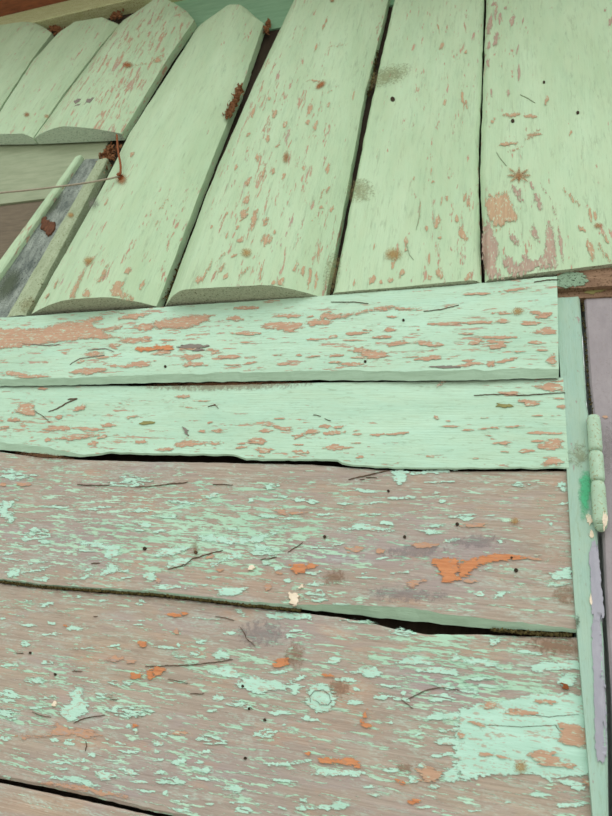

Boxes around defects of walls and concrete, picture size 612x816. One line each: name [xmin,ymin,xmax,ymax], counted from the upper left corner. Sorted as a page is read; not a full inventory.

peeling [40,216,56,237]
peeling [464,181,612,295]
peeling [0,313,256,375]
peeling [231,305,444,366]
peeling [417,311,557,367]
peeling [236,418,409,458]
peeling [434,415,565,466]
peeling [266,612,312,650]
peeling [30,680,154,734]
peeling [206,649,411,721]
peeling [394,650,589,791]
peeling [48,732,260,814]